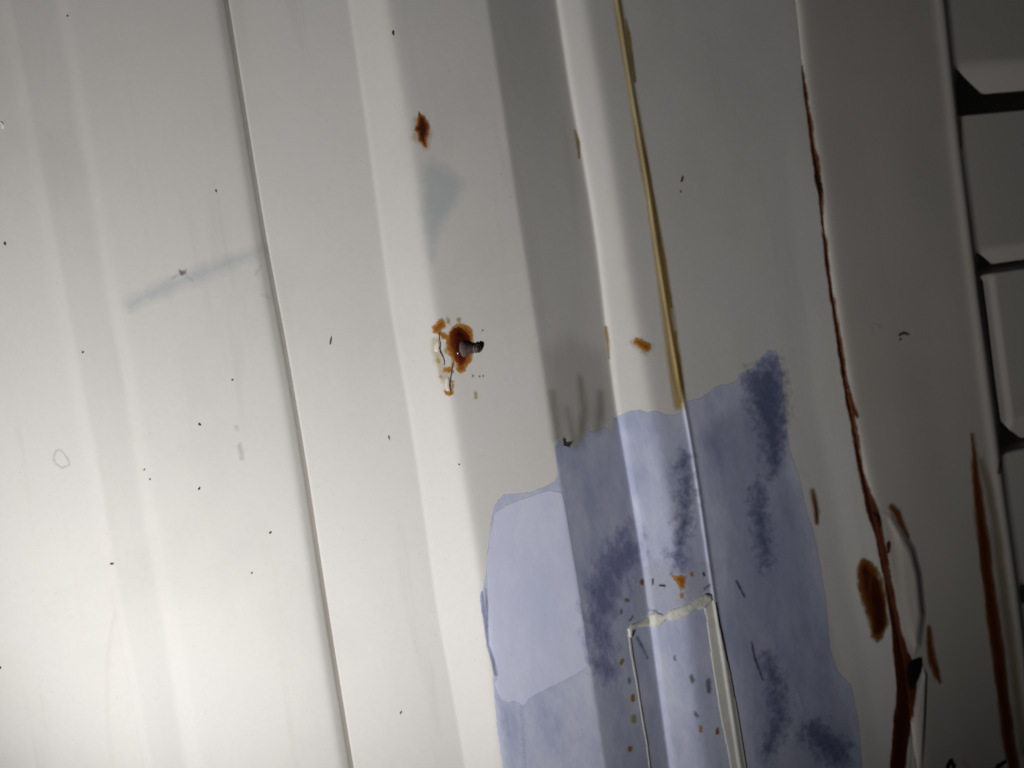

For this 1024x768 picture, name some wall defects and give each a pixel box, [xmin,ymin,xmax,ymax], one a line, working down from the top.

rust [415,113,430,148]
rust [432,318,483,396]
rust [634,338,650,352]
rust [802,66,916,768]
rust [971,434,1019,768]
rust [927,626,941,683]